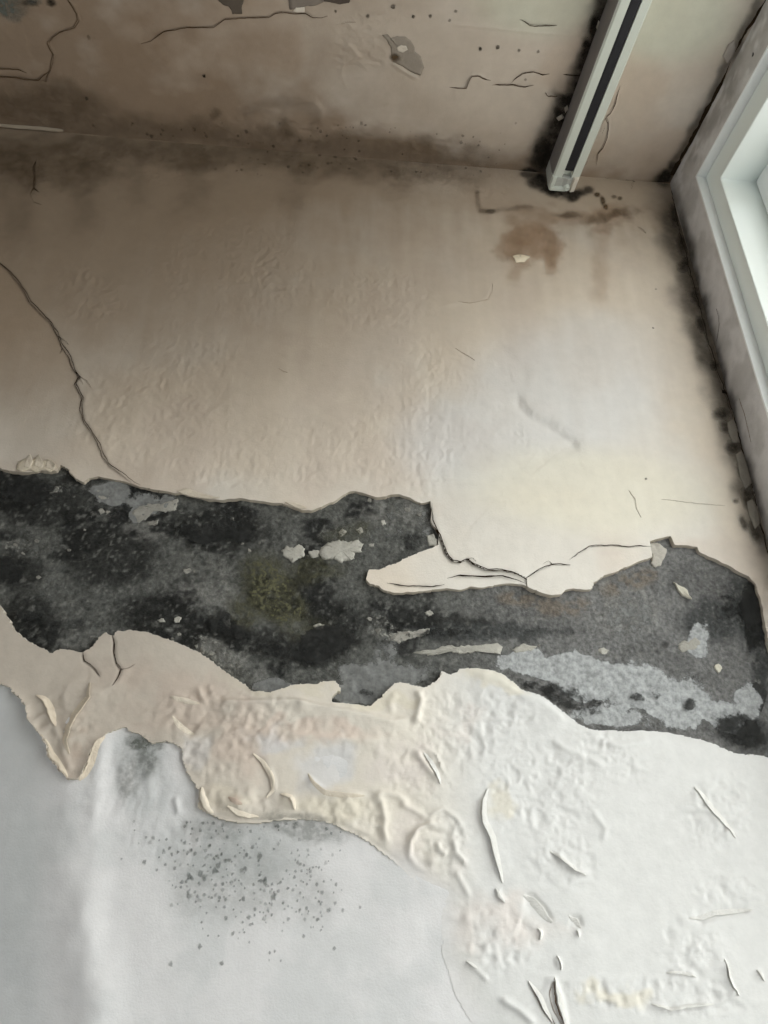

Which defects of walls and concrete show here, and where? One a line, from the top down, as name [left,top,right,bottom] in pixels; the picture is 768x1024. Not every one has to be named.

crack [2,0,79,82]
crack [141,11,353,44]
peeling [382,34,424,78]
crack [450,71,573,97]
mould [521,0,607,194]
crack [0,263,133,481]
mould [664,213,743,460]
mould [740,484,757,506]
crack [390,509,650,587]
crack [83,635,131,683]
leakage [130,738,150,750]
spalling [0,453,768,1024]